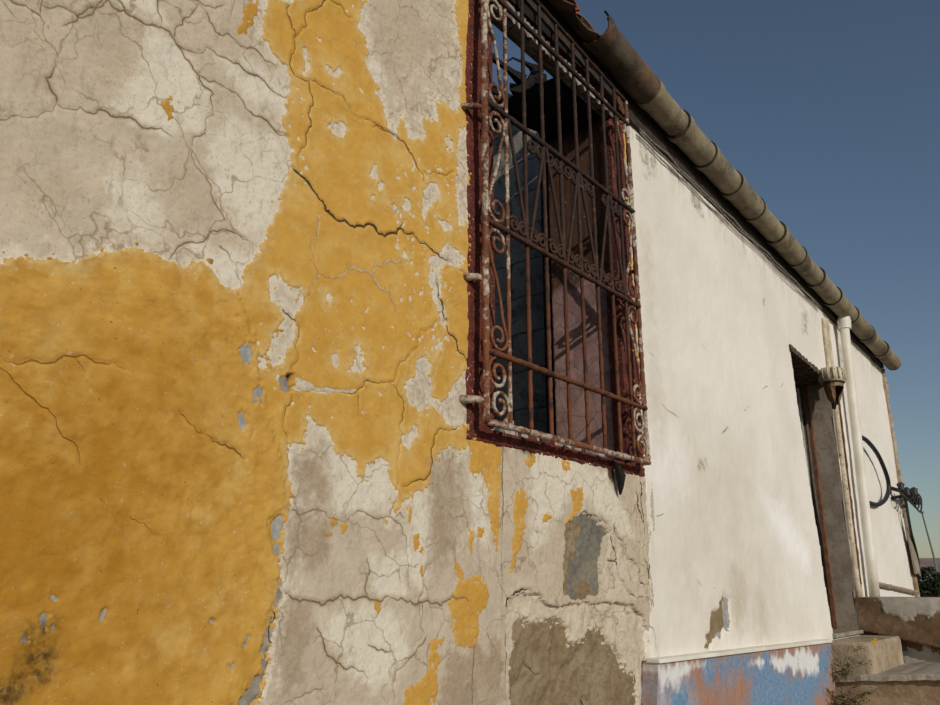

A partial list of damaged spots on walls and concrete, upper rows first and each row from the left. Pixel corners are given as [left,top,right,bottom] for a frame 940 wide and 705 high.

peeling [0,0,309,291]
peeling [302,37,333,76]
peeling [327,121,346,138]
peeling [345,0,463,140]
crack [0,0,469,570]
peeling [229,127,655,705]
rust [608,460,616,482]
peeling [39,613,55,635]
crack [255,563,468,699]
crack [501,435,541,700]
crack [582,482,663,598]
peeling [704,595,730,649]